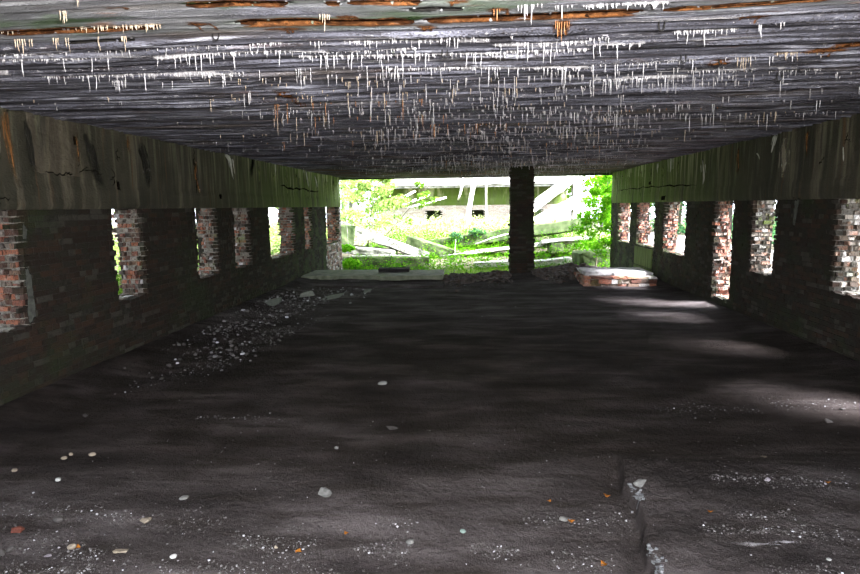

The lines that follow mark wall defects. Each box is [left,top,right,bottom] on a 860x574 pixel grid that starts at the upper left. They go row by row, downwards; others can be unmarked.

damp [583,1,763,41]
efflorescence [0,50,124,75]
efflorescence [44,70,240,79]
efflorescence [134,37,645,72]
efflorescence [594,59,756,82]